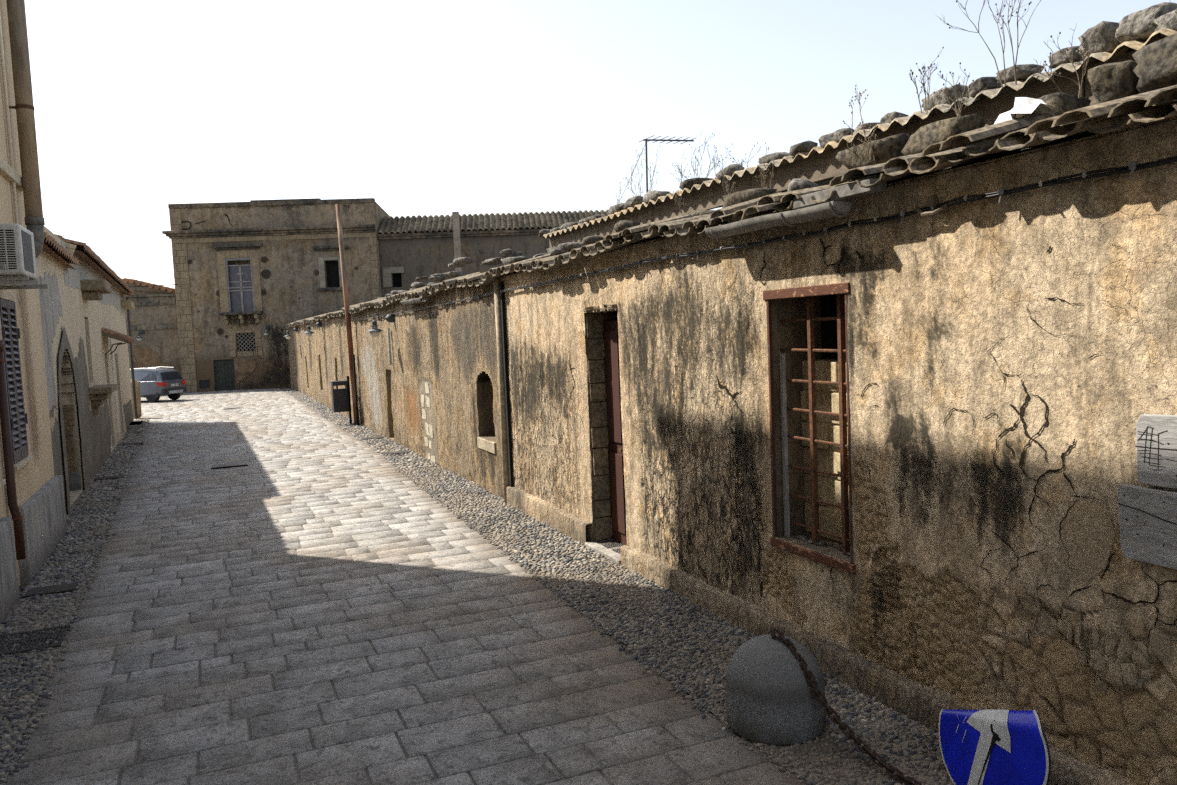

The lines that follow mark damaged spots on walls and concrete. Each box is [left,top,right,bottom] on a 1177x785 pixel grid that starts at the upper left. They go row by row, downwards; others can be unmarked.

leakage [407,304,495,378]
leakage [471,389,496,482]
leakage [510,339,569,431]
leakage [618,262,761,461]
leakage [729,408,766,573]
leakage [881,378,1027,545]
crack [942,297,1177,628]